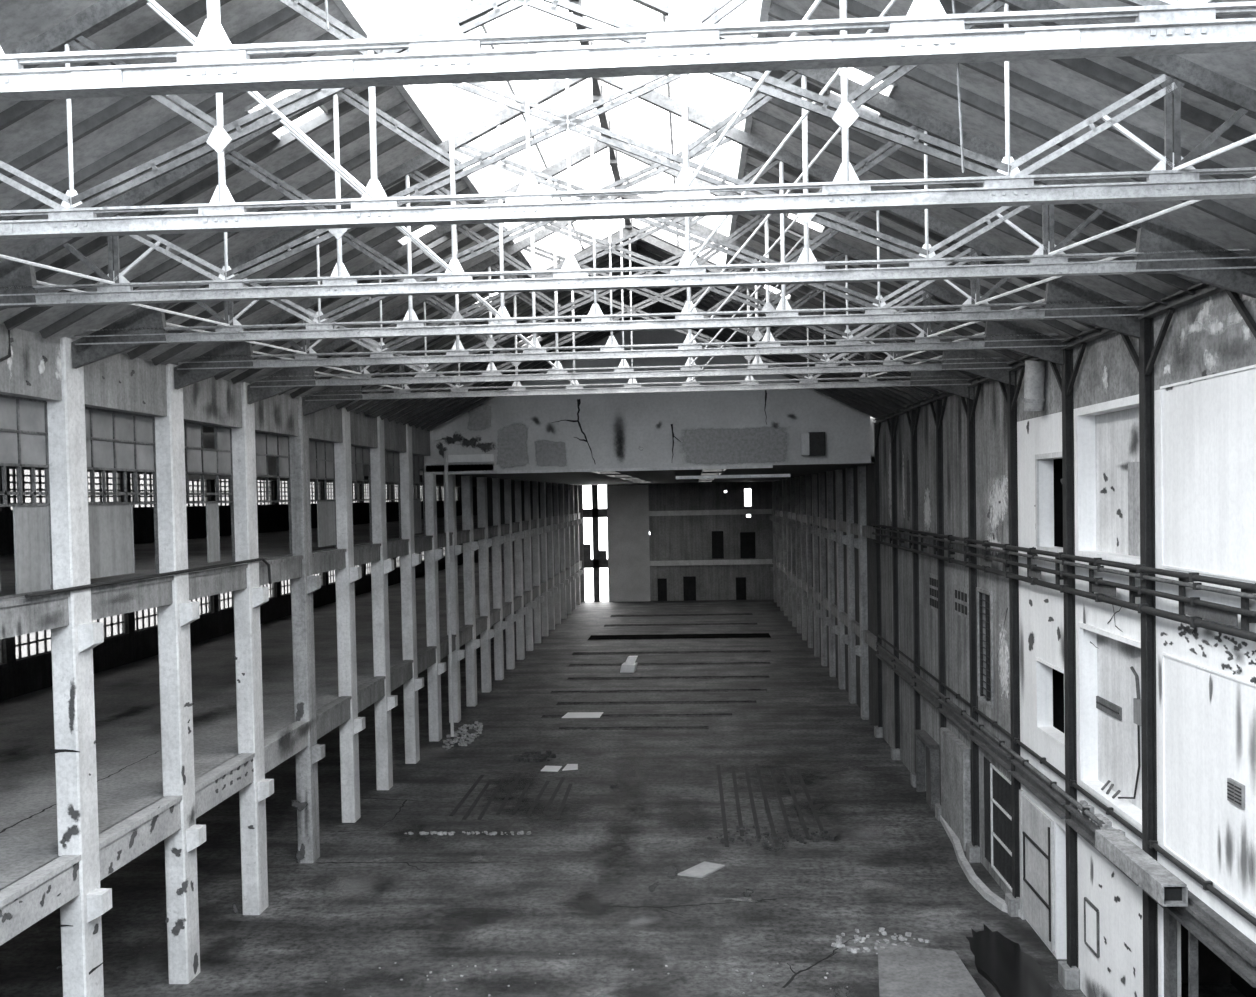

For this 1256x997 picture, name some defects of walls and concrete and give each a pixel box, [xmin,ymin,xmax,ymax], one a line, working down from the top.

crack [551,399,596,464]
damp [615,420,624,458]